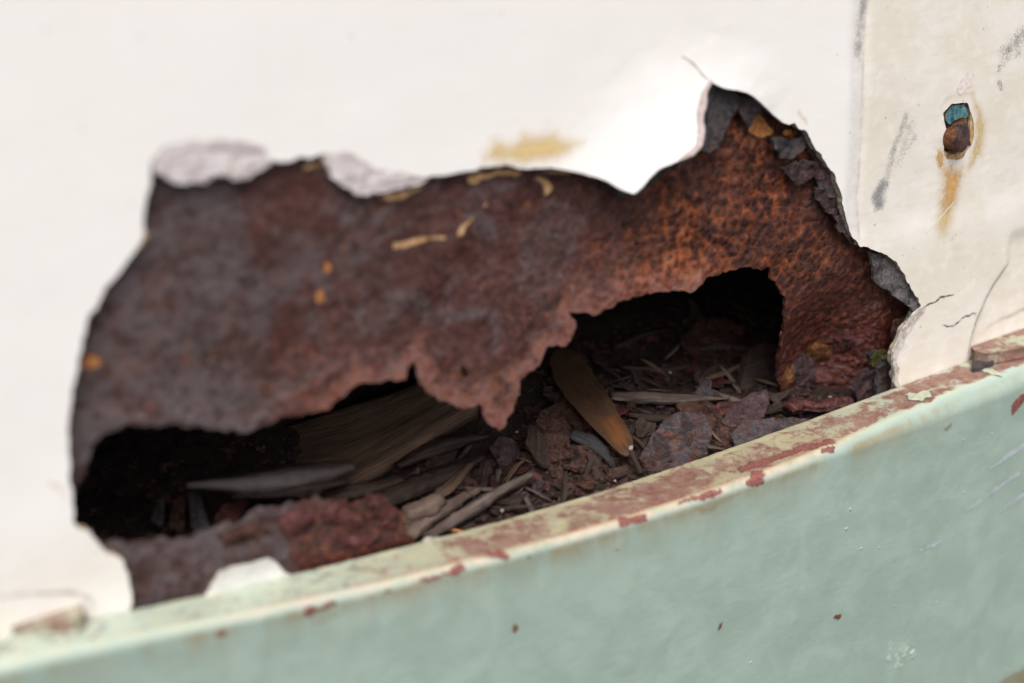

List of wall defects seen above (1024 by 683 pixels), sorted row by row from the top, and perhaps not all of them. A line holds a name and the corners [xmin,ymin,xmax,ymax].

peeling [738,94,765,128]
peeling [151,139,272,184]
peeling [319,151,427,195]
peeling [602,157,689,197]
rust [938,151,959,227]
rust [68,108,909,495]
peeling [866,251,932,402]
crack [925,270,1004,349]
rust [617,514,647,527]
peeling [205,558,292,596]
rust [89,491,414,611]
rust [419,562,465,583]